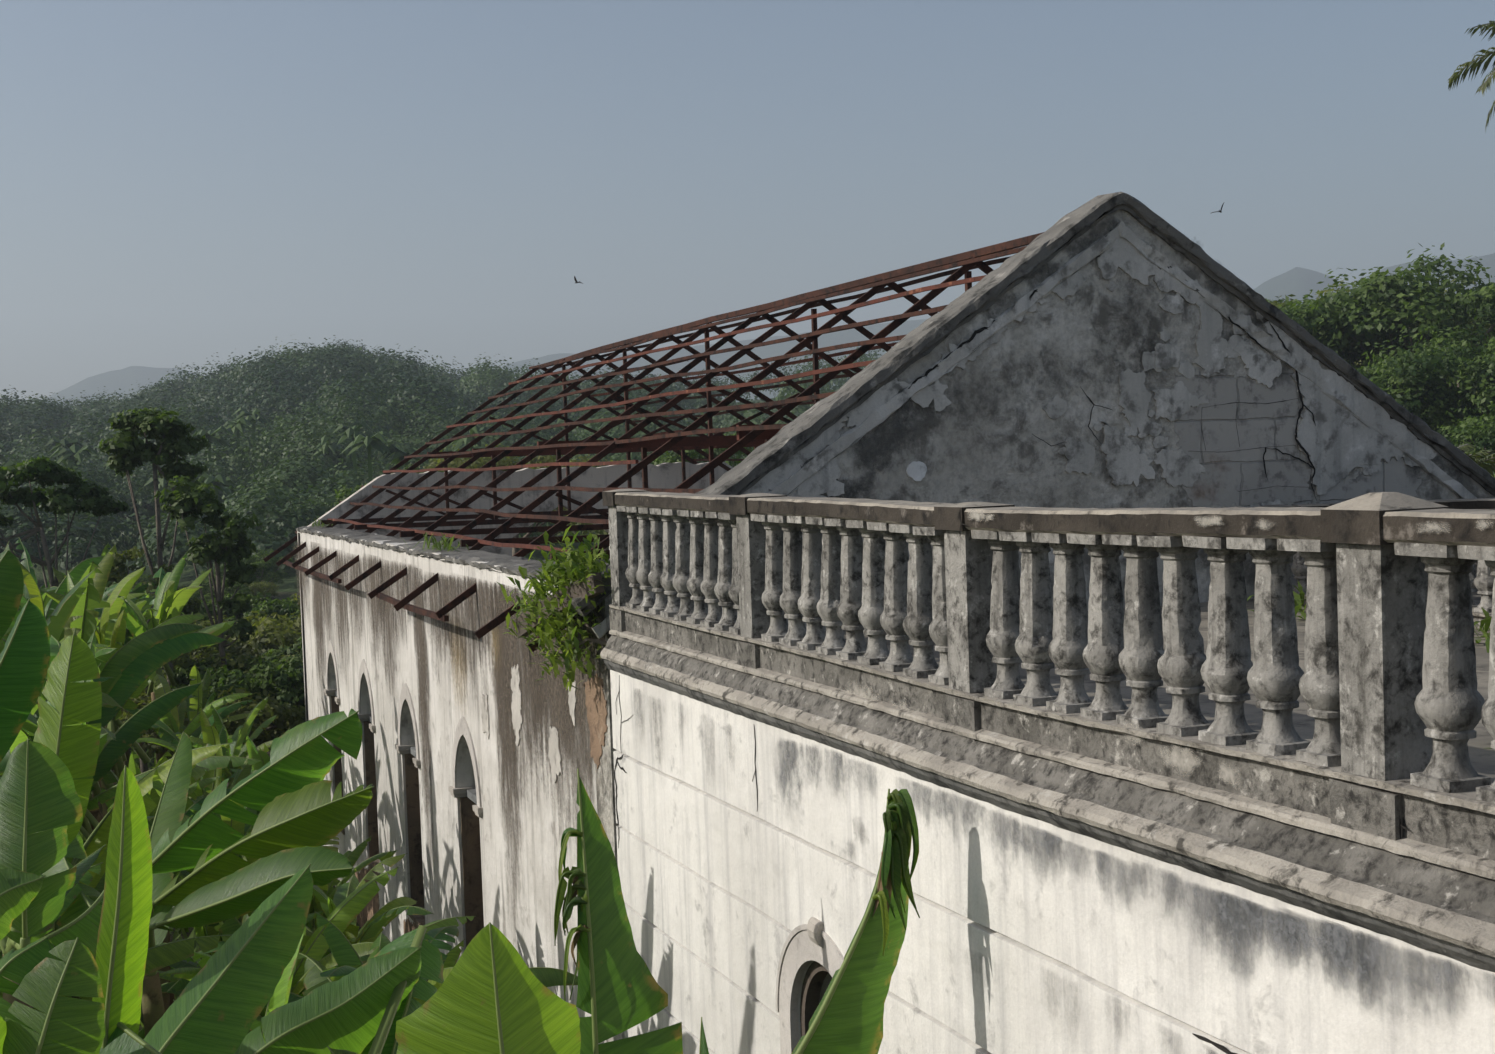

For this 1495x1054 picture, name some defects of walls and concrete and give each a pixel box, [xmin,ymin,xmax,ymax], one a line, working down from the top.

spalling [741,237,1437,528]
crack [1168,266,1317,501]
leakage [295,542,606,884]
leakage [779,742,794,793]
leakage [1025,830,1059,857]